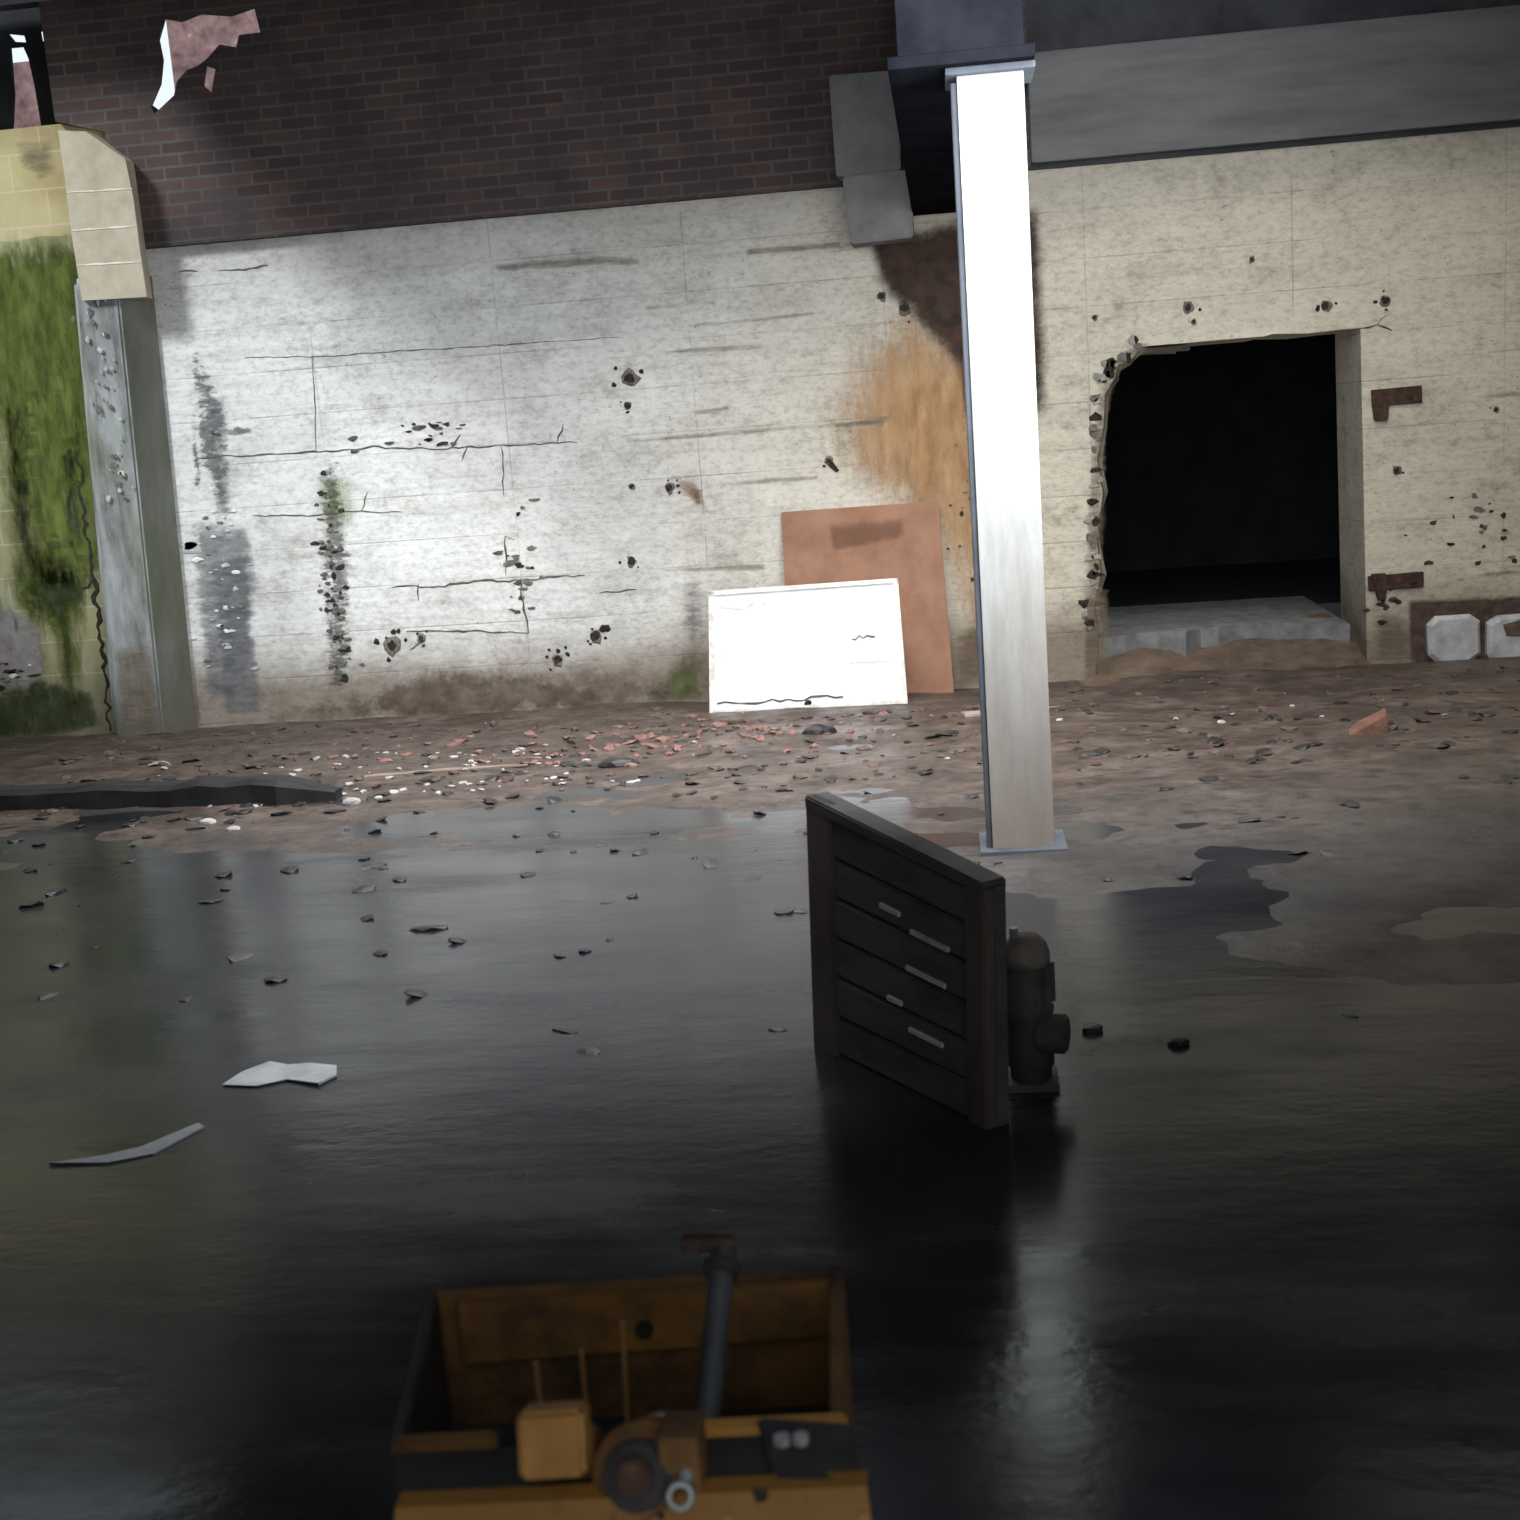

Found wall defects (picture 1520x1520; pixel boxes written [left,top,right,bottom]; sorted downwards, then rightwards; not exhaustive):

damp [1,255,30,550]
damp [40,251,97,556]
damp [193,352,250,512]
damp [199,530,257,712]
mould [320,462,350,685]
rust [855,329,976,615]
spalling [1078,334,1143,677]